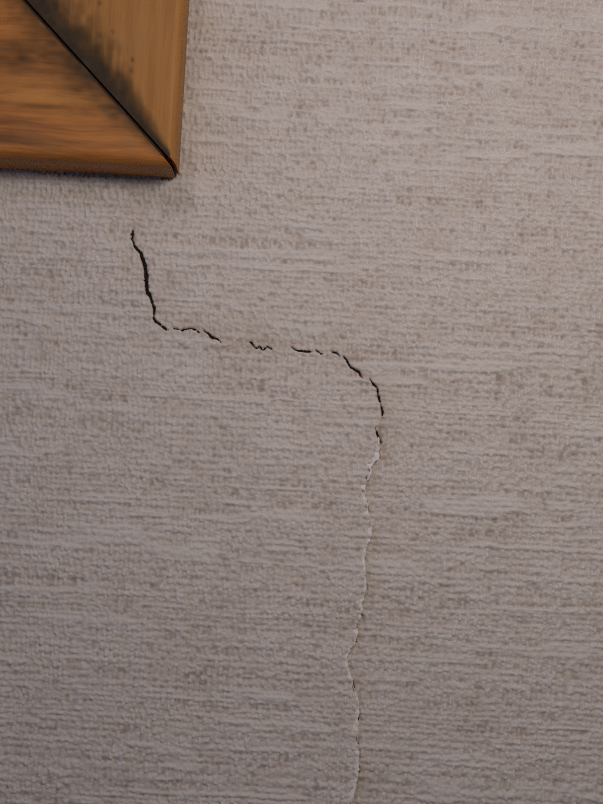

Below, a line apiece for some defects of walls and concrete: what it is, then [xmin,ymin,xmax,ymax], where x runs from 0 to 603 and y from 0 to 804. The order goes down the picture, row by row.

crack [131,230,221,343]
crack [291,347,384,804]